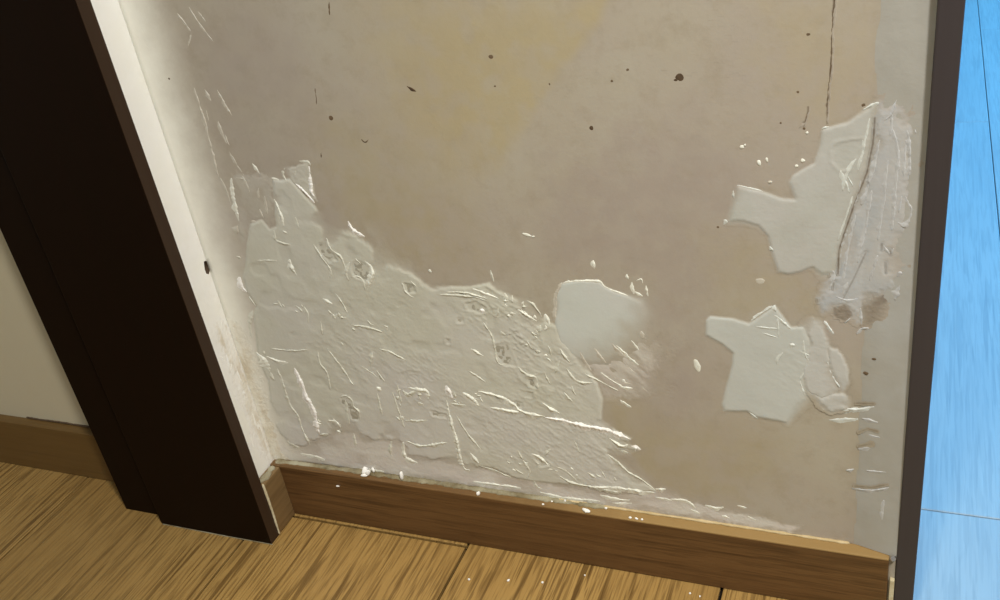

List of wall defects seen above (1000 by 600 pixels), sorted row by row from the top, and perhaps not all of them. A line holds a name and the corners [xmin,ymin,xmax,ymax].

crack [798,0,837,130]
peeling [282,161,319,203]
peeling [210,315,292,467]